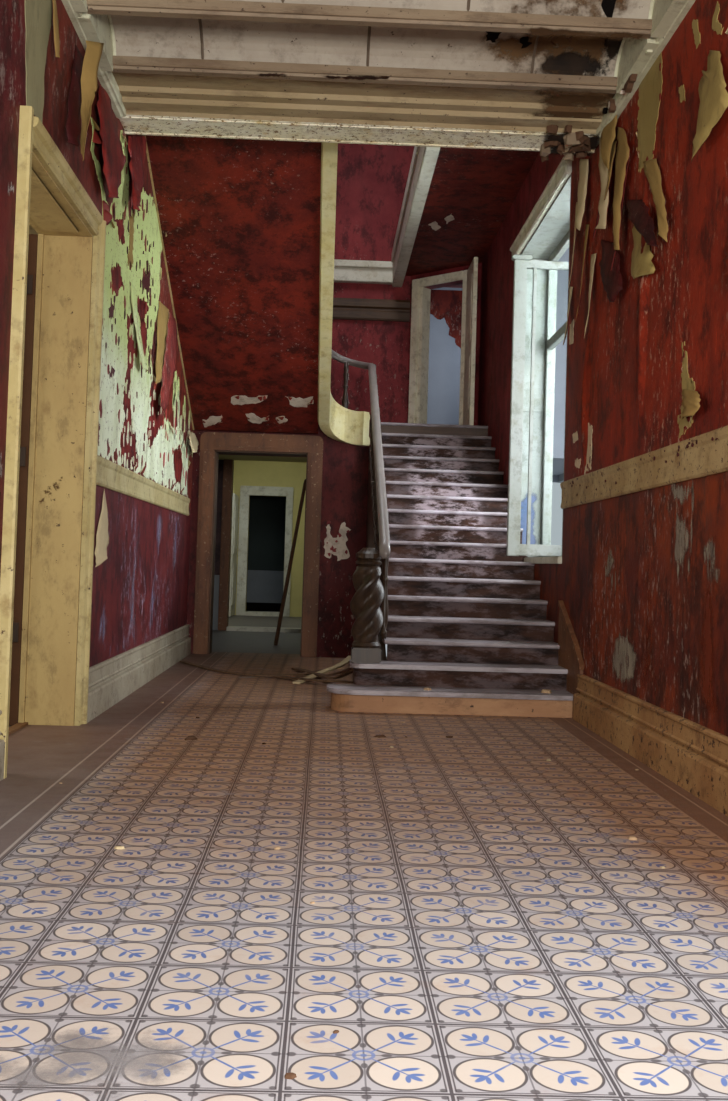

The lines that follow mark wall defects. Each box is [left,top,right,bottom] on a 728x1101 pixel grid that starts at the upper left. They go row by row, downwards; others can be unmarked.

leakage [513,0,602,17]
peeling [692,1,728,49]
leakage [483,27,643,71]
peeling [602,50,663,173]
peeling [90,118,193,498]
peeling [203,415,223,427]
peeling [231,395,314,424]
peeling [640,341,698,463]
peeling [324,521,350,561]